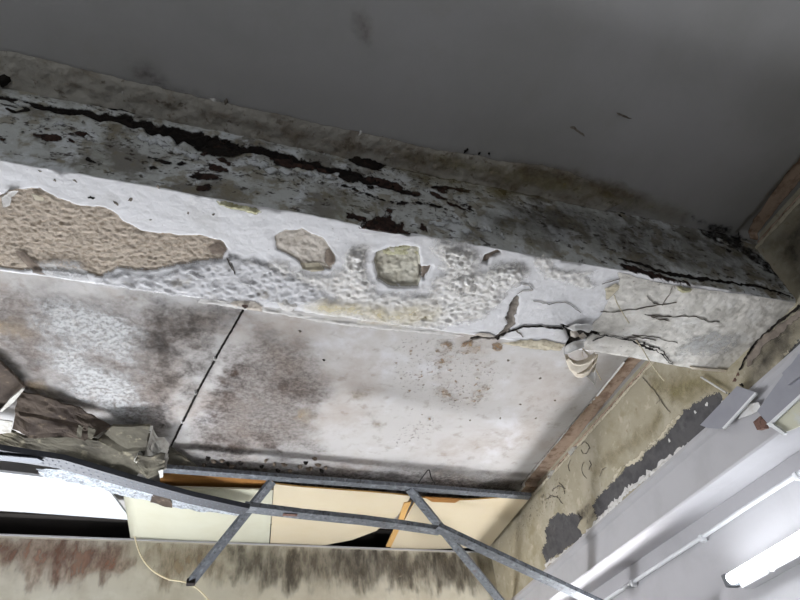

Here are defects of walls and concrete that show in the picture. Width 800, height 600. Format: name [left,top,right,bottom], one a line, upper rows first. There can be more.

flaking render [0,188,227,280]
flaking render [275,228,335,272]
flaking render [374,245,431,286]
crack [470,282,581,340]
crack [591,258,800,370]
water stain [0,298,215,427]
crack [168,309,244,454]
water stain [202,341,316,455]
water stain [402,340,492,408]
peeling [542,392,722,568]
water stain [238,547,483,591]